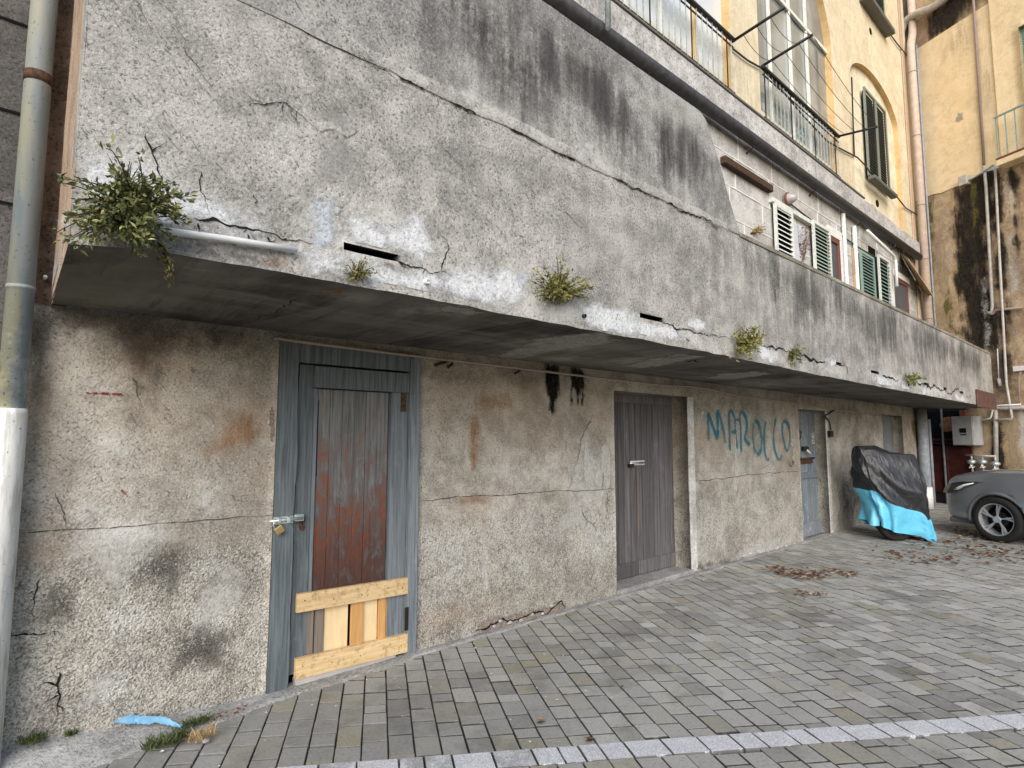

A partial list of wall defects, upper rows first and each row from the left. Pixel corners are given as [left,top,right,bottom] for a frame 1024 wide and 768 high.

damp [543,38,629,125]
crack [145,133,314,244]
damp [914,168,1021,391]
damp [492,303,705,413]
crack [765,345,848,373]
crack [882,375,972,398]
crack [423,417,612,543]
crack [28,493,269,533]
crack [11,579,63,636]
spalling [476,600,566,632]
crack [38,672,63,713]